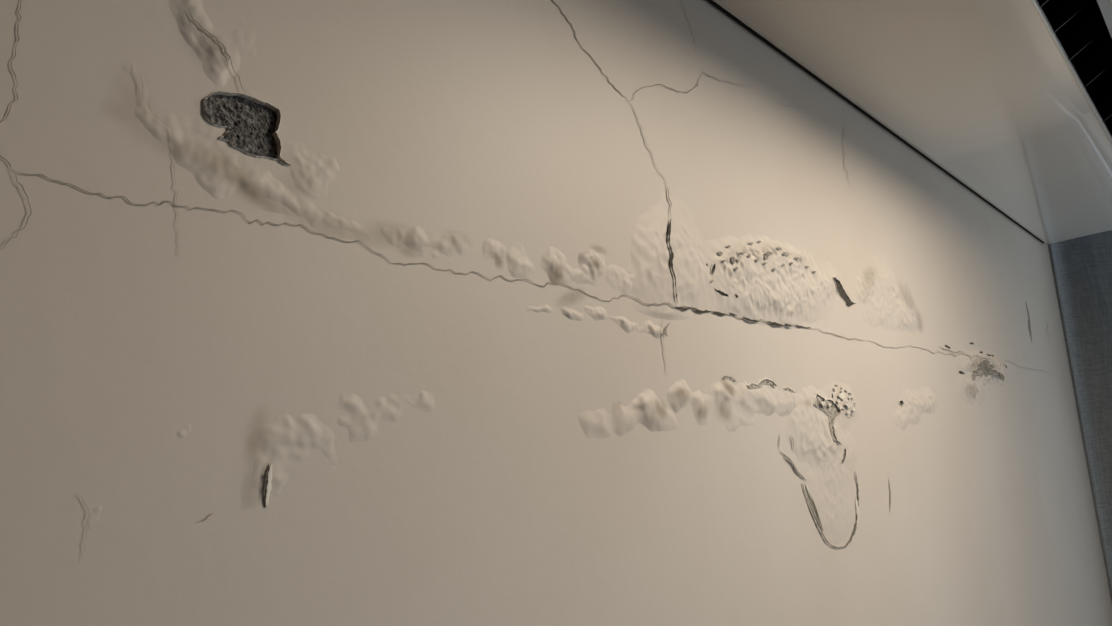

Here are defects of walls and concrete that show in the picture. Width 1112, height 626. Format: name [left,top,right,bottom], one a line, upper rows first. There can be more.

spalling [202,91,291,166]
crack [0,0,1049,373]
spalling [958,342,1007,381]
spalling [813,384,856,464]
peeling [779,435,860,549]